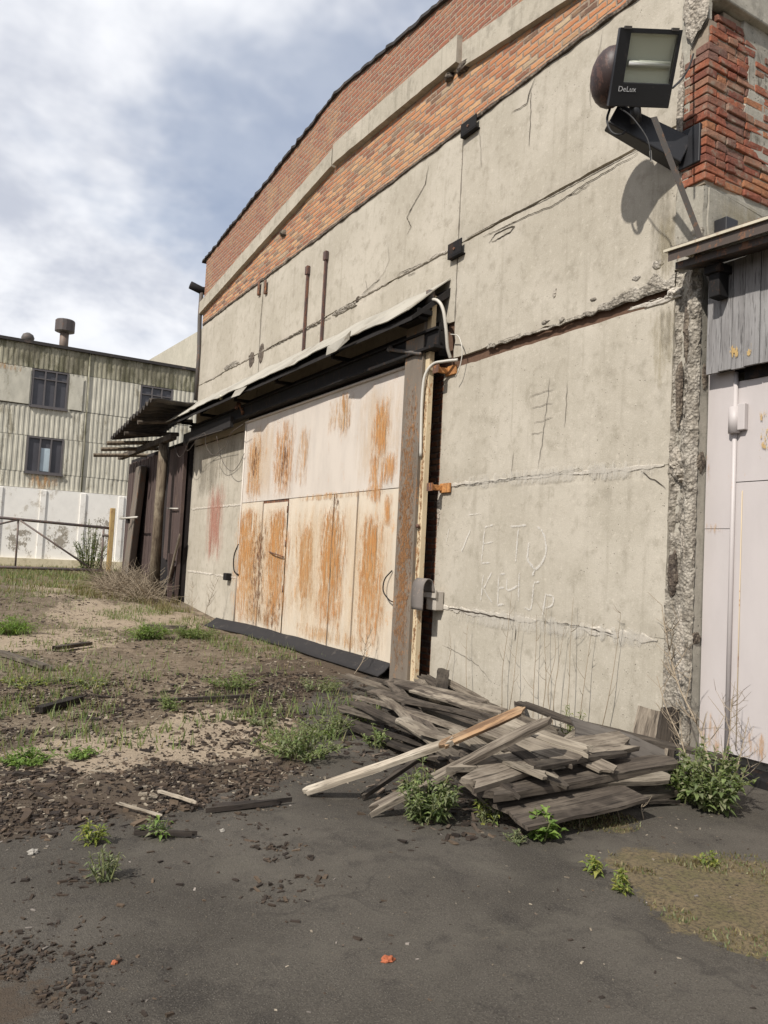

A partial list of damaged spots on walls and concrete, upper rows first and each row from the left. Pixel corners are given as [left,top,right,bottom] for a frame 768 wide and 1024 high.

crack [468,150,636,242]
crack [258,299,331,368]
crack [455,378,581,487]
corrosion [233,376,428,669]
spalling [487,253,707,763]
crack [449,608,516,641]
crack [544,622,614,635]